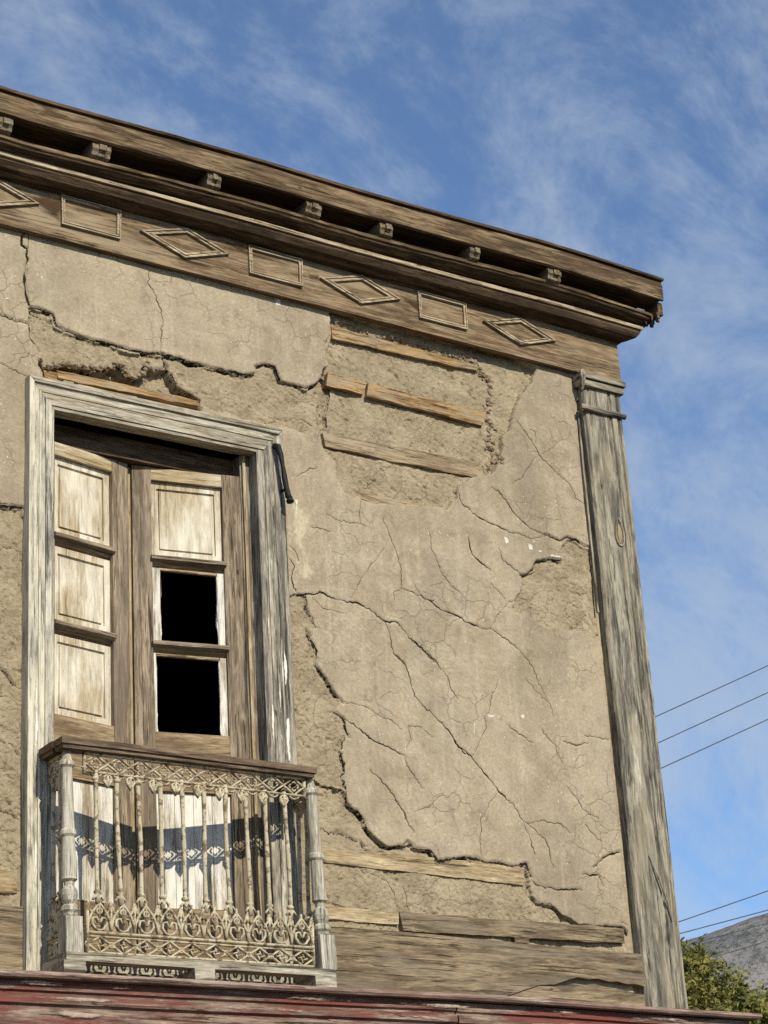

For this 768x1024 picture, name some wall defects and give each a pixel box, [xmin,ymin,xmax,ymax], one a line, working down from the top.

crack [0,233,317,411]
flaking render [28,310,534,510]
flaking render [272,594,585,925]
crack [290,421,619,924]
flaking render [327,920,399,931]
flaking render [433,934,512,942]
flaking render [528,939,628,952]